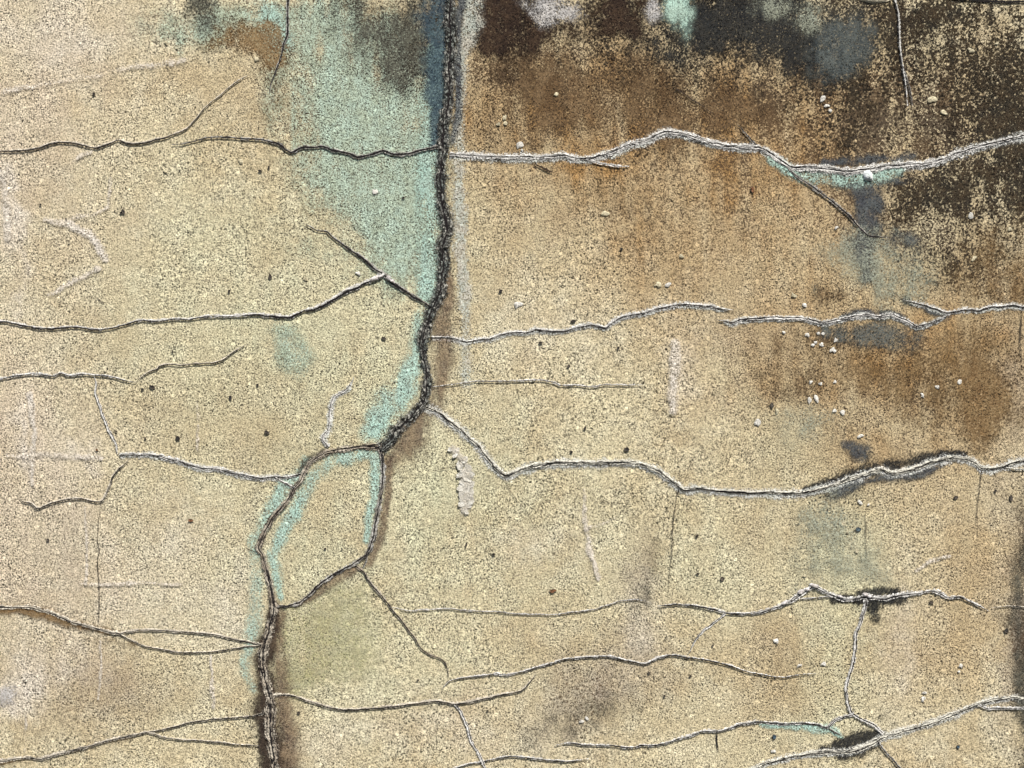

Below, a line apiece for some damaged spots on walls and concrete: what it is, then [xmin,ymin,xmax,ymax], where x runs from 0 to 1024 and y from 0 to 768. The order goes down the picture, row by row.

leakage [159,0,449,303]
corrosion [448,20,789,164]
crack [450,125,1024,238]
crack [894,0,913,106]
crack [960,0,1024,8]
crack [0,0,732,768]
leakage [240,0,1024,768]
crack [718,299,1024,367]
corrosion [742,220,1024,456]
crack [424,404,1024,521]
crack [441,654,817,689]
crack [555,583,1024,768]